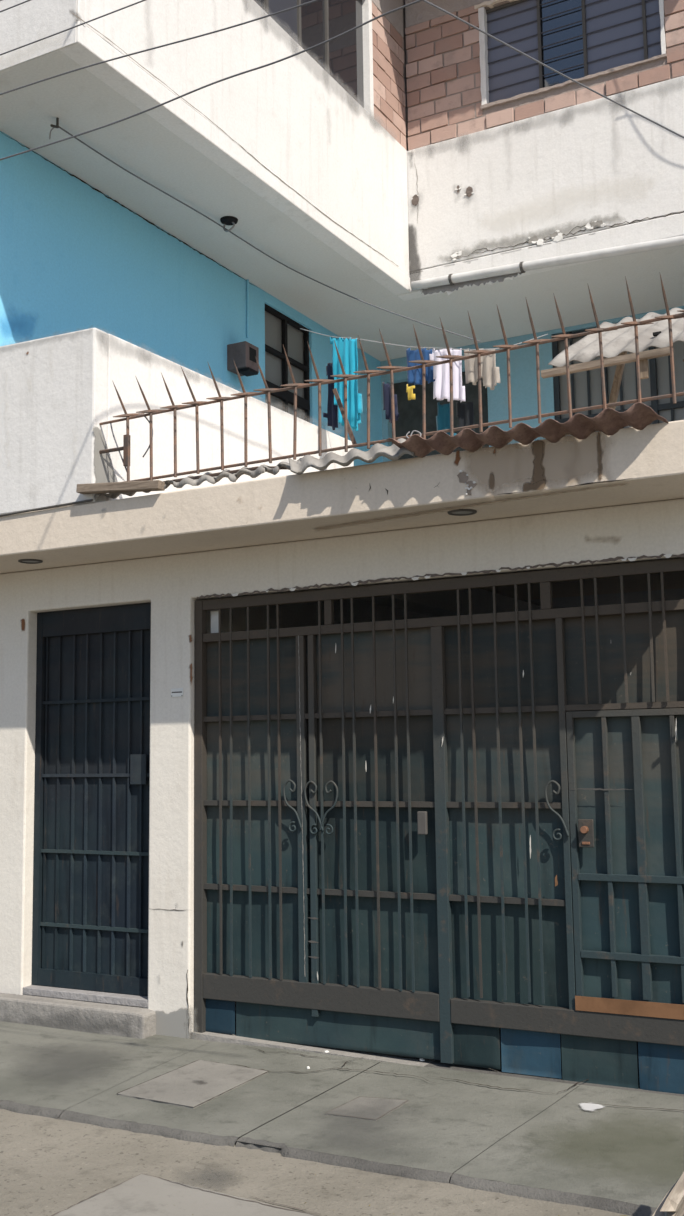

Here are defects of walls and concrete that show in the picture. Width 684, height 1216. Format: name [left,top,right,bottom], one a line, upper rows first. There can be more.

peeling [585,220,606,230]
peeling [527,230,563,245]
peeling [457,470,477,496]